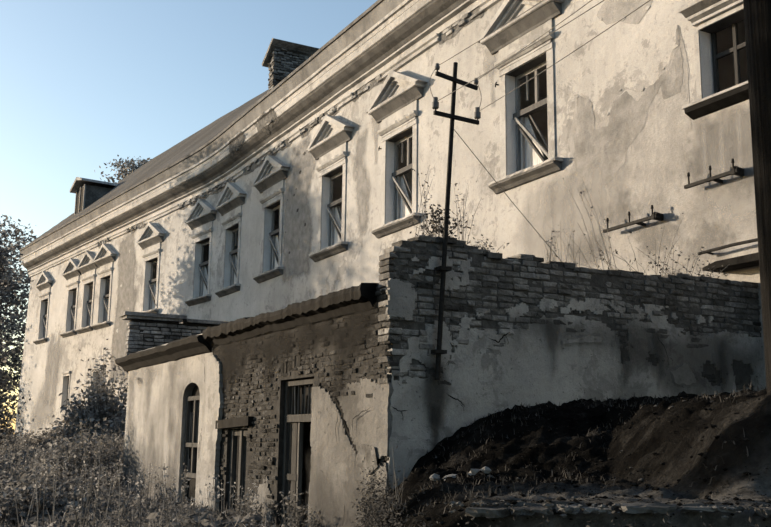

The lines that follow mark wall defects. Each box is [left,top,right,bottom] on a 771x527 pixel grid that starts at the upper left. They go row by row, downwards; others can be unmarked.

flaking render [597,0,652,25]
flaking render [219,25,763,527]